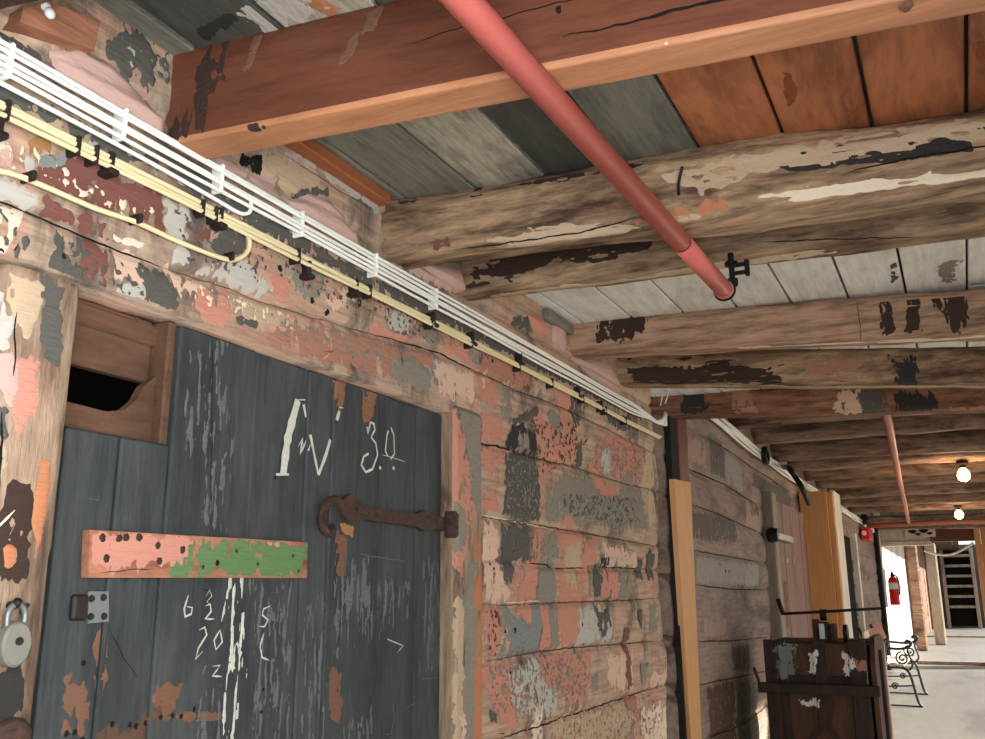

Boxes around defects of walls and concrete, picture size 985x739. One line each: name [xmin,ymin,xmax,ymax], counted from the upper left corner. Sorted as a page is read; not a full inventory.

peeling [236,0,341,33]
crack [565,0,725,36]
peeling [661,118,985,223]
peeling [749,250,837,265]
peeling [738,335,985,349]
peeling [684,385,985,415]
peeling [0,148,694,739]
rust [340,523,354,537]